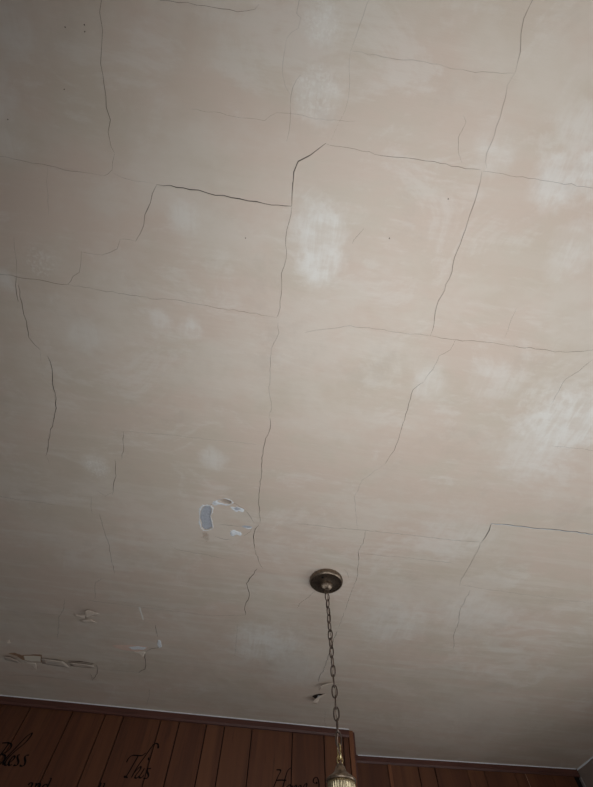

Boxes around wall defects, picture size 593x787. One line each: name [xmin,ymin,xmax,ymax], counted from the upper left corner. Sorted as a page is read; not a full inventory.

crack [0,0,590,464]
crack [83,384,272,673]
flaking render [198,498,252,542]
crack [306,474,593,682]